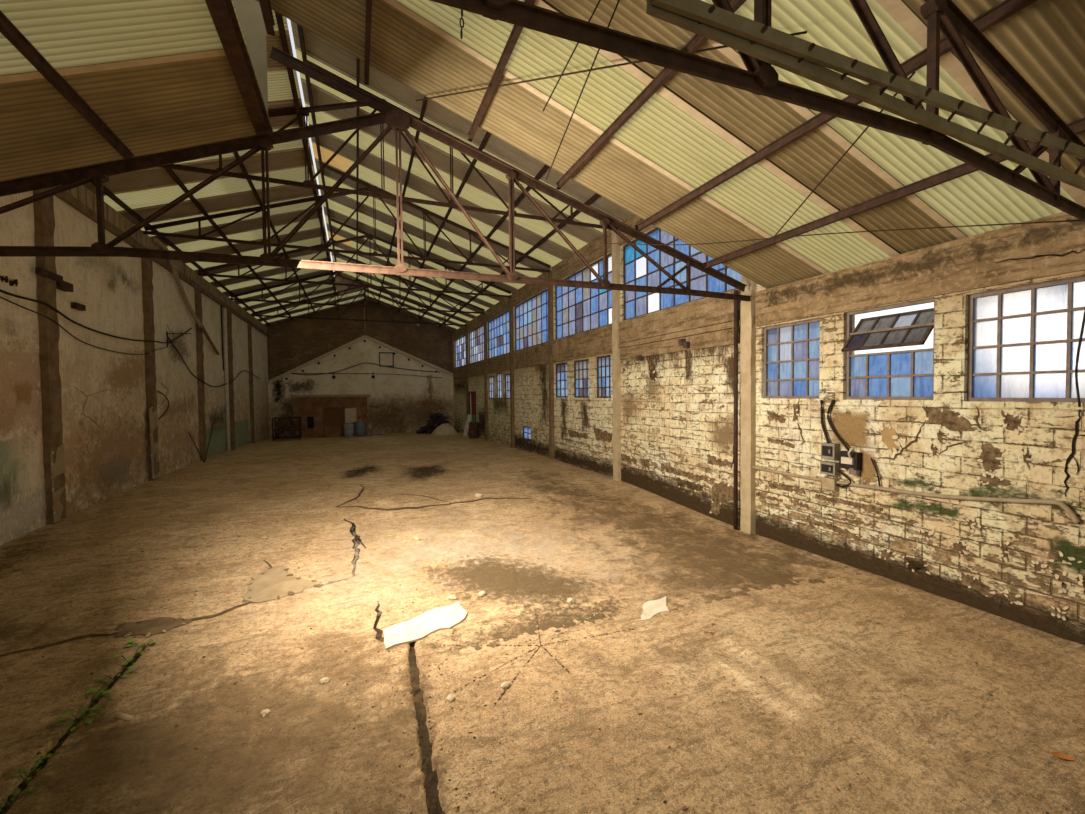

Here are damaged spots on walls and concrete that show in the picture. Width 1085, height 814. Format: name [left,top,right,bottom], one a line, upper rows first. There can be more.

damp [620,345,739,421]
crack [321,484,529,585]
peeling [621,454,741,515]
damp [515,364,1085,645]
peeling [830,410,877,480]
peeling [880,422,900,454]
peeling [922,405,977,459]
peeling [977,443,1016,487]
crack [1064,409,1085,497]
crack [0,632,118,657]
crack [191,602,253,620]
crack [373,603,384,641]